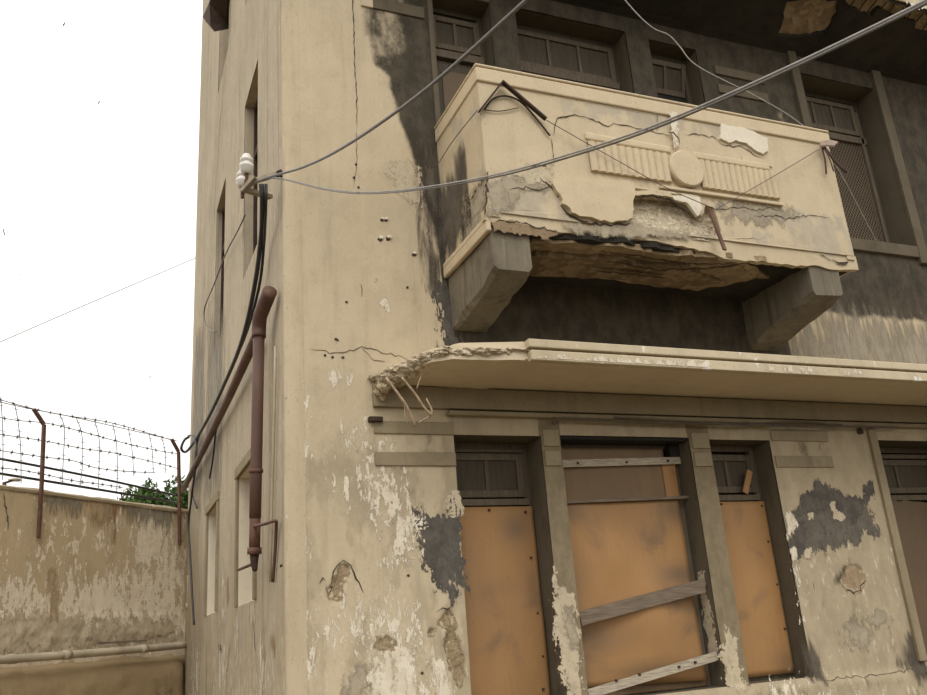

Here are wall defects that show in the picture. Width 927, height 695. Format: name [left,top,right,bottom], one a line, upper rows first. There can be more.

spalling [778,0,927,34]
crack [351,0,359,181]
crack [462,114,669,242]
peeling [487,163,690,240]
spalling [635,190,702,217]
spalling [367,345,709,427]
spalling [0,493,203,695]
peeling [306,416,466,695]
peeling [552,565,586,695]
peeling [698,570,748,693]
peeling [785,511,814,606]
peeling [830,501,846,521]